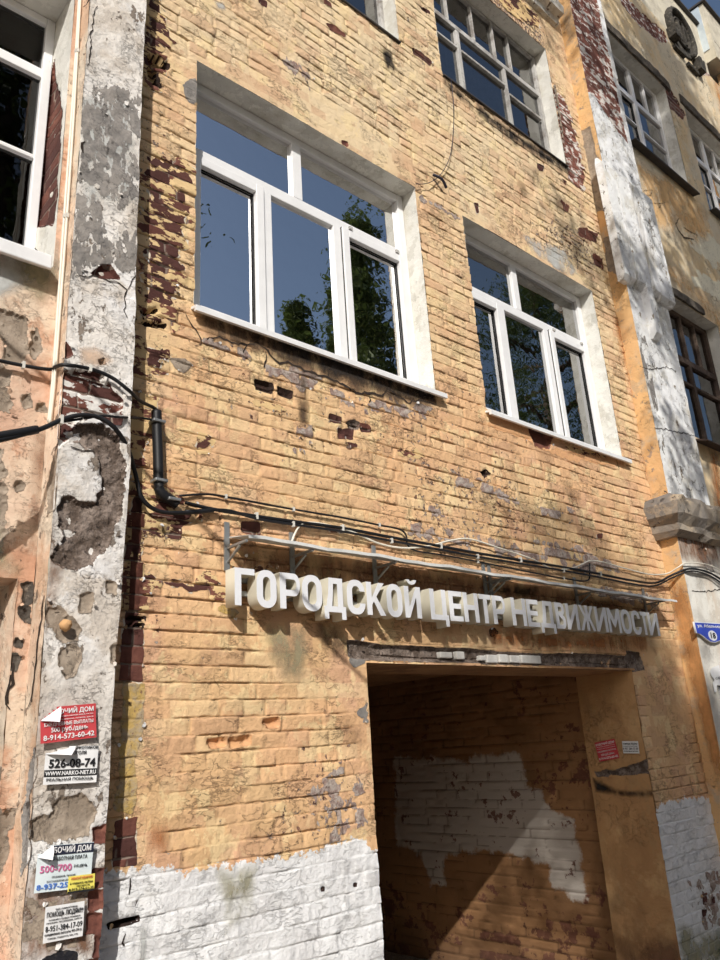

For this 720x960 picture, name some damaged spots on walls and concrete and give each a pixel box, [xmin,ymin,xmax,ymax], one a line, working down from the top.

crack [83,0,98,66]
flaking render [570,0,628,143]
flaking render [621,0,668,43]
flaking render [37,59,63,228]
flaking render [71,0,198,332]
peeling [253,364,433,449]
spalling [0,308,253,960]
peeling [687,871,720,930]